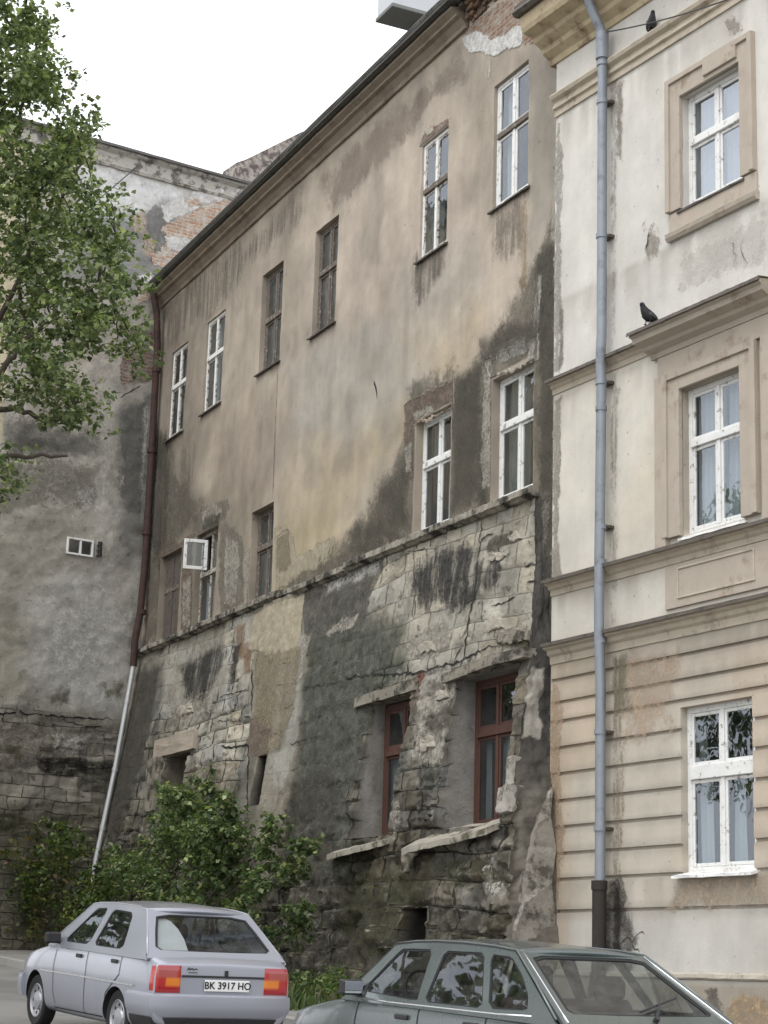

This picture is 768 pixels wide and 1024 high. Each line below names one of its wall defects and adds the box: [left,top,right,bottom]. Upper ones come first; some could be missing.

peeling [462,25,522,56]
flaking render [135,188,242,303]
water stain [283,224,555,626]
water stain [7,388,200,647]
spalling [486,531,523,561]
crack [0,711,111,731]
water stain [40,574,131,697]
water stain [180,645,240,701]
peeling [325,613,359,637]
crack [217,521,536,818]
spalling [408,617,456,791]
water stain [606,865,636,970]